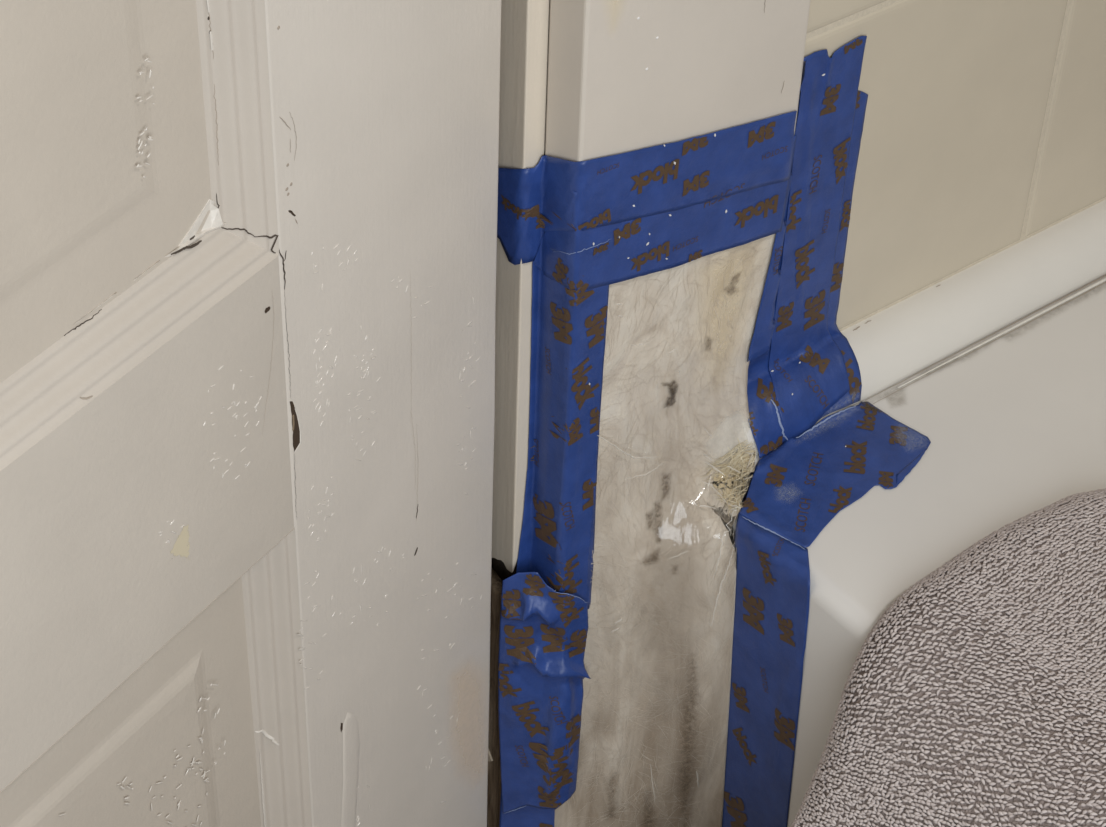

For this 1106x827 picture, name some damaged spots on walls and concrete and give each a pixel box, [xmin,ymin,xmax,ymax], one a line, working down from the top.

crack [212,85,220,165]
crack [216,193,291,434]
peeling [290,401,301,452]